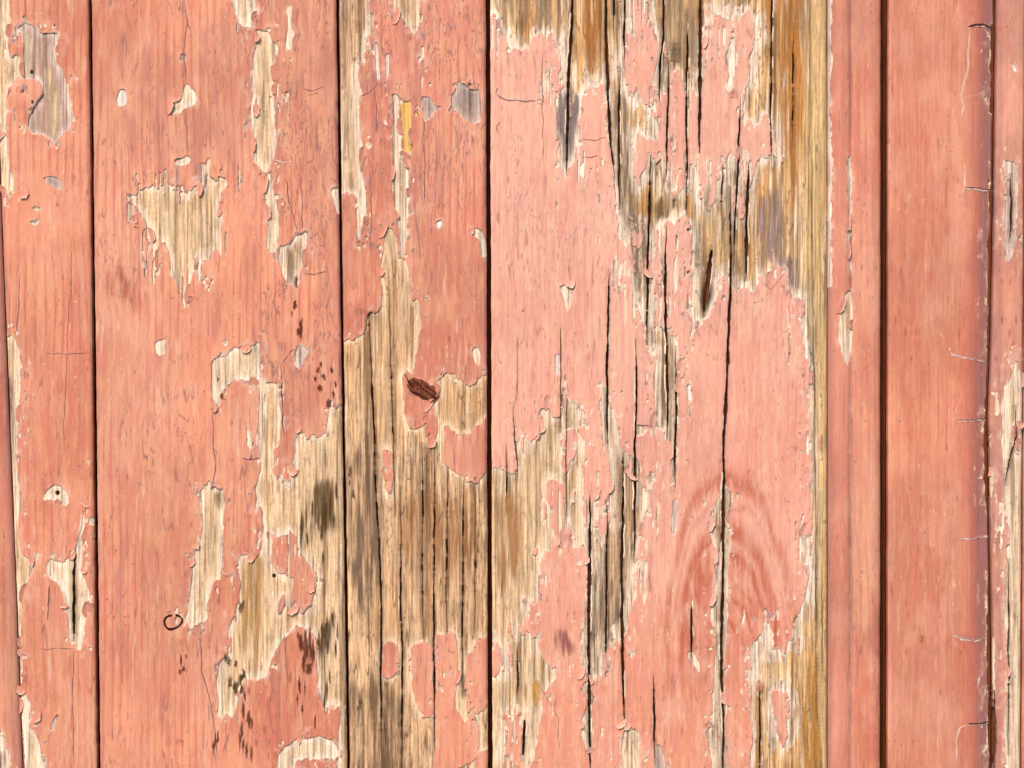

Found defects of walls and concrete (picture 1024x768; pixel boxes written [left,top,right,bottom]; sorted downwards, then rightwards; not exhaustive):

peeling [0,0,78,225]
peeling [0,323,96,768]
peeling [116,0,314,308]
peeling [166,0,853,768]
crack [560,0,823,768]
peeling [974,344,1024,768]
peeling [981,145,1024,274]